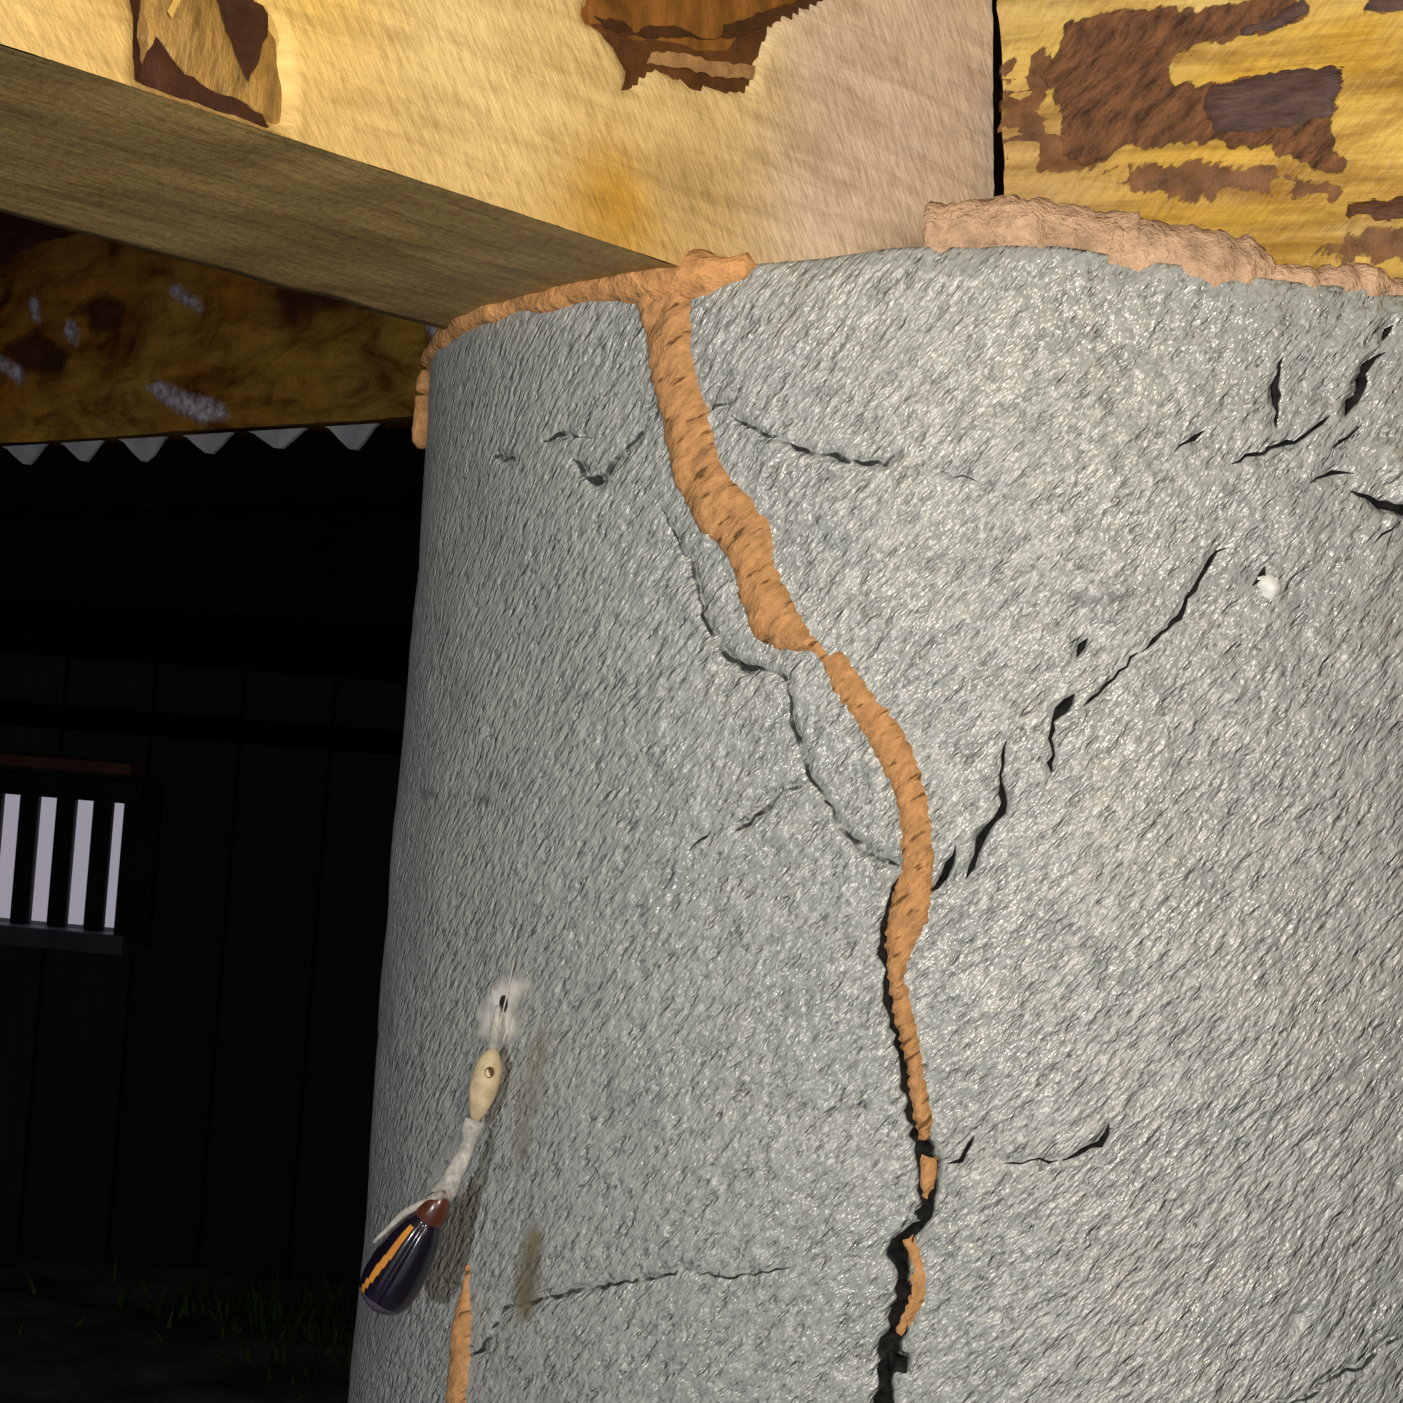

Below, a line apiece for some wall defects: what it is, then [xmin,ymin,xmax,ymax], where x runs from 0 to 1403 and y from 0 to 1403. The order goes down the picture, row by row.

crack [494,454,515,462]
crack [544,416,657,486]
crack [713,403,901,467]
crack [1174,430,1205,452]
crack [1231,325,1403,543]
crack [1253,566,1266,586]
crack [1047,548,1225,771]
crack [930,740,1007,892]
crack [661,505,974,1403]
crack [1004,1123,1109,1164]
crack [473,1267,790,1356]